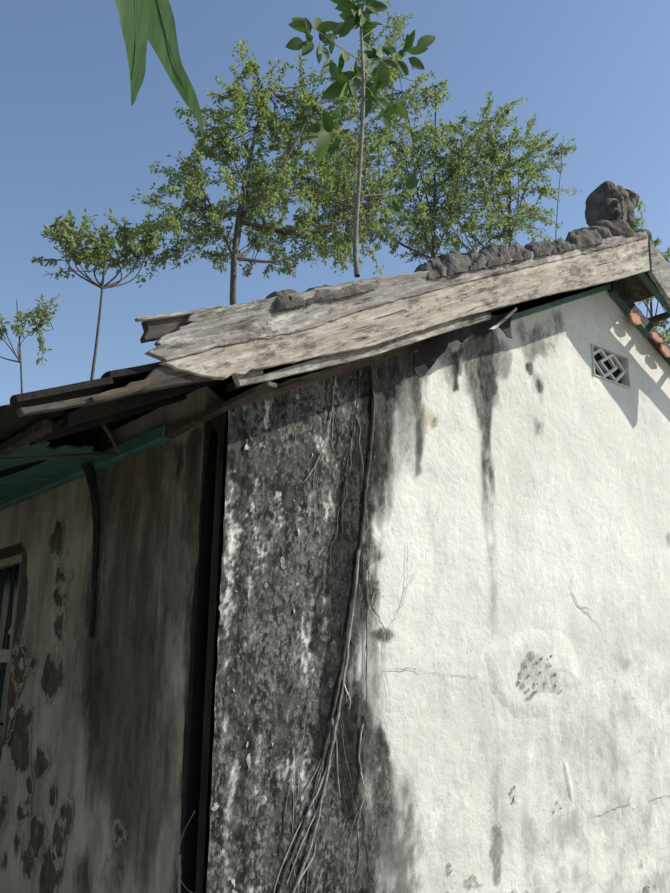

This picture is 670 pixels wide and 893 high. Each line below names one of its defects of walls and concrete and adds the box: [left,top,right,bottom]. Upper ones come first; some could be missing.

damp [520,315,562,392]
damp [439,330,512,498]
damp [206,351,428,893]
crack [361,543,491,710]
crack [571,575,609,644]
peeling [0,514,74,893]
spalling [518,651,563,700]
crack [584,795,670,816]
damp [491,825,504,884]